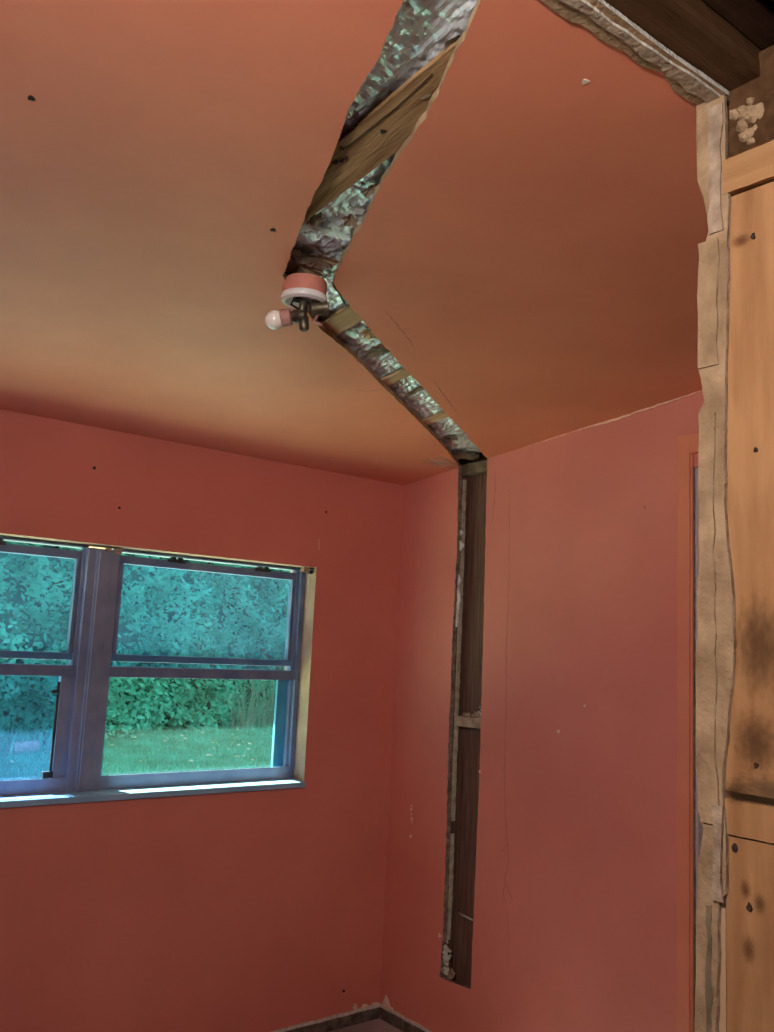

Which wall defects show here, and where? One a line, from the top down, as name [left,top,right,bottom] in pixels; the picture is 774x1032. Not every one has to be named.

spalling [541,0,737,1032]